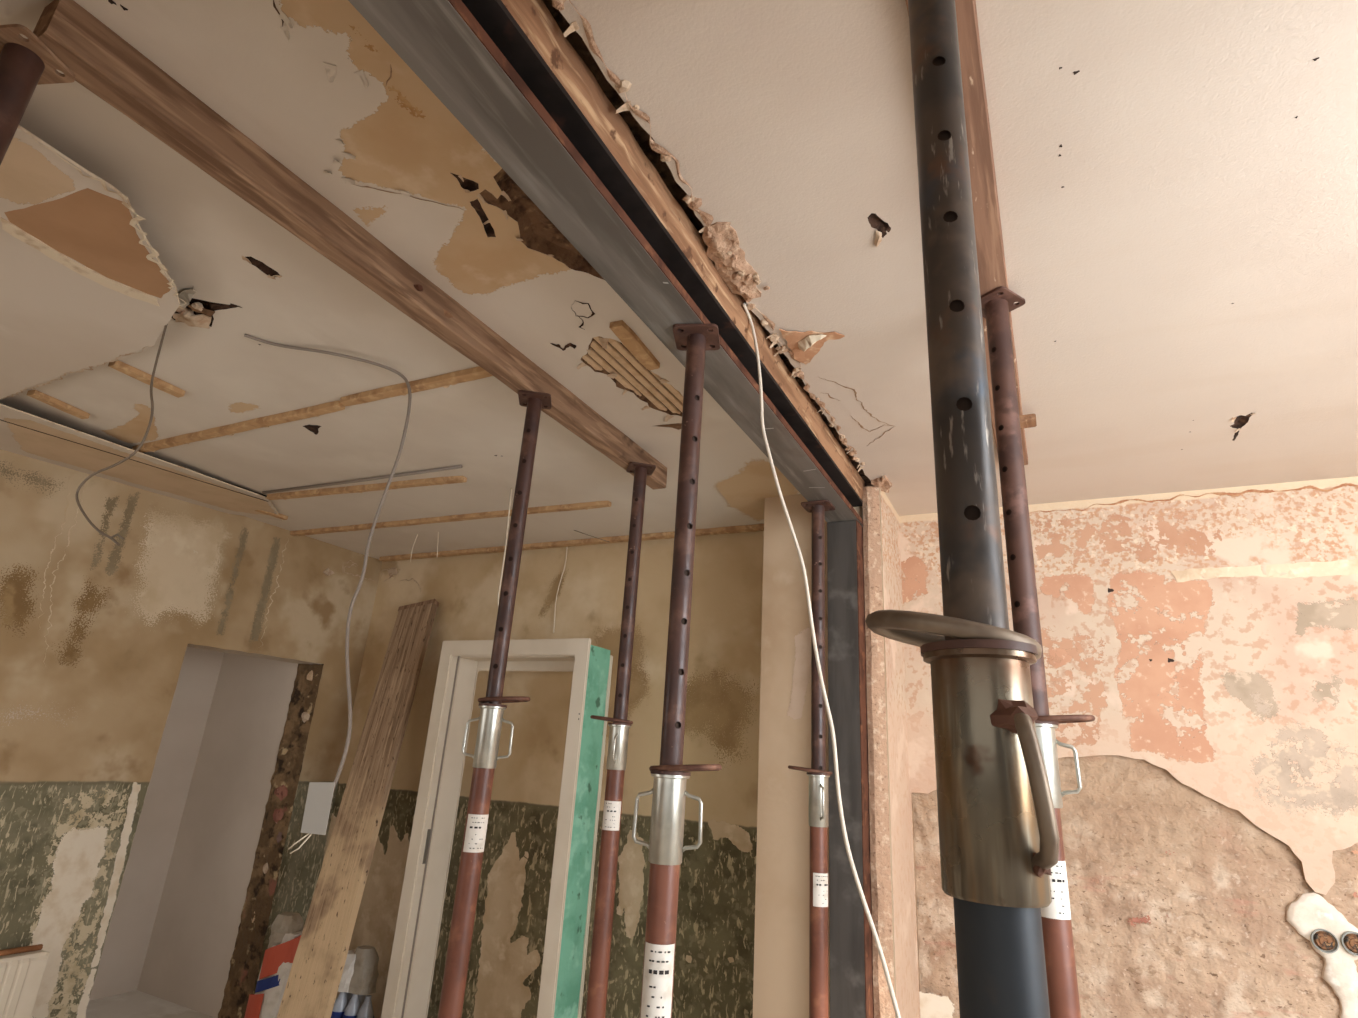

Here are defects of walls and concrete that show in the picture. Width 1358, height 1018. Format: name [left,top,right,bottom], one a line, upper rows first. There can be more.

peeling [279,0,572,295]
spalling [551,0,865,472]
damp [0,562,41,639]
damp [51,492,141,672]
damp [250,537,281,642]
peeling [712,459,800,522]
spalling [862,486,895,1018]
spalling [1033,509,1358,1018]
peeling [29,782,141,1018]
peeling [473,832,540,1018]
peeling [616,830,645,939]
spalling [912,790,960,1018]